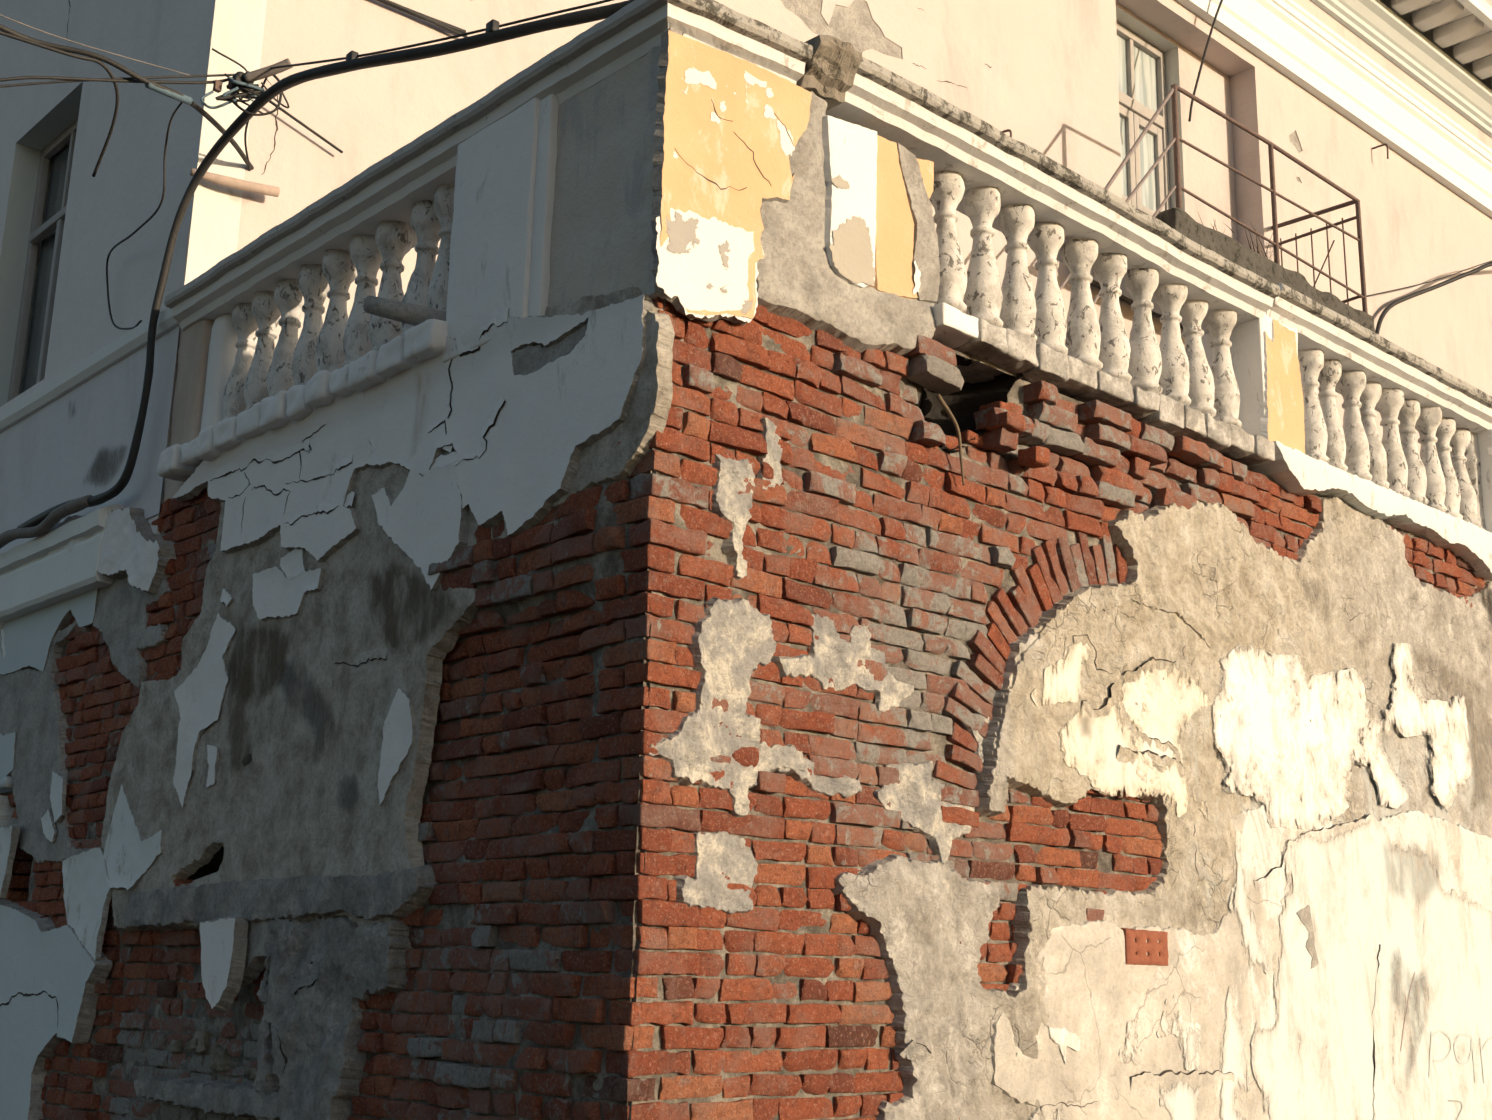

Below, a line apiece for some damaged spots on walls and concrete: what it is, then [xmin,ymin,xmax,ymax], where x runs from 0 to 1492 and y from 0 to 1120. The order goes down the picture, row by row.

spalling [781,0,902,59]
crack [673,99,771,197]
peeling [682,67,795,157]
spalling [831,175,850,189]
spalling [397,208,1492,1120]
peeling [377,688,415,806]
spalling [0,487,325,1120]
crack [1041,1101,1098,1115]
crack [1131,1069,1235,1091]
crack [1372,944,1381,1120]